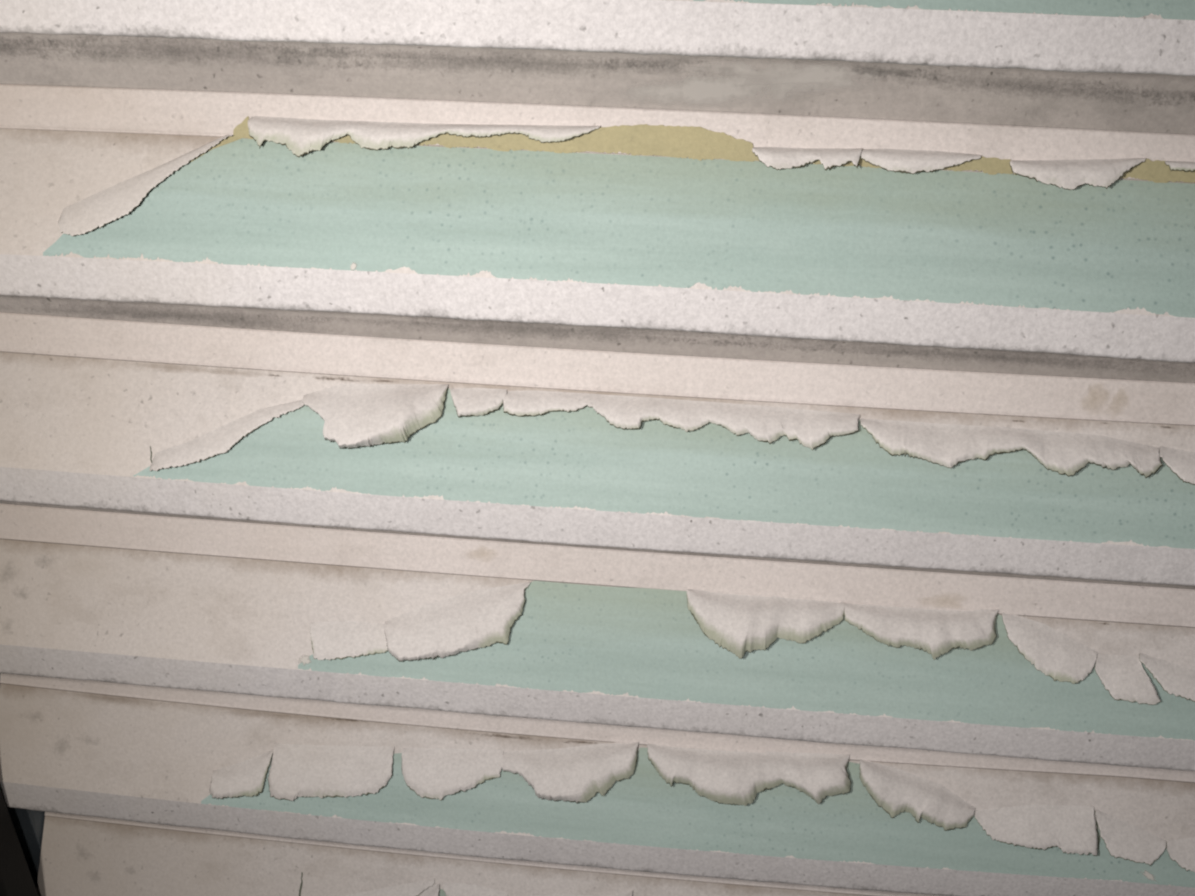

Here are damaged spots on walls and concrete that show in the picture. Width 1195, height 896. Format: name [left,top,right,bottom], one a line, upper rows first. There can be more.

peeling [43,116,1195,318]
peeling [133,384,1195,549]
peeling [298,581,1195,741]
peeling [345,878,508,896]
peeling [201,742,1195,888]